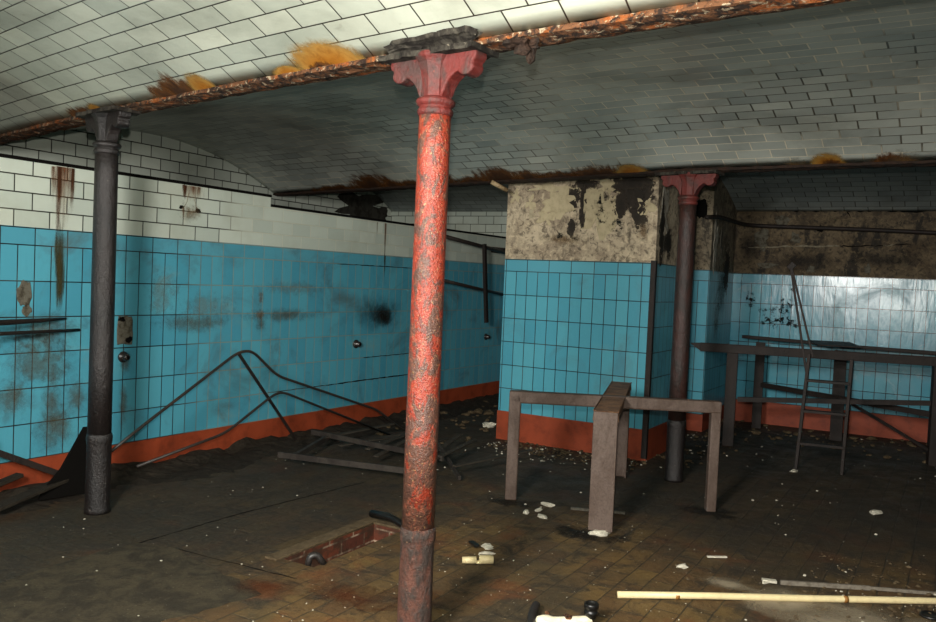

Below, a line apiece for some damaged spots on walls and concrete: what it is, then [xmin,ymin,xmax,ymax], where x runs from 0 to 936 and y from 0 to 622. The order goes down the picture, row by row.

spalling [384,25,483,54]
corrosion [274,42,364,75]
corrosion [149,75,215,98]
corrosion [52,166,75,224]
peeling [510,179,620,240]
peeling [637,198,657,215]
corrosion [55,235,64,303]
mould [746,293,797,327]